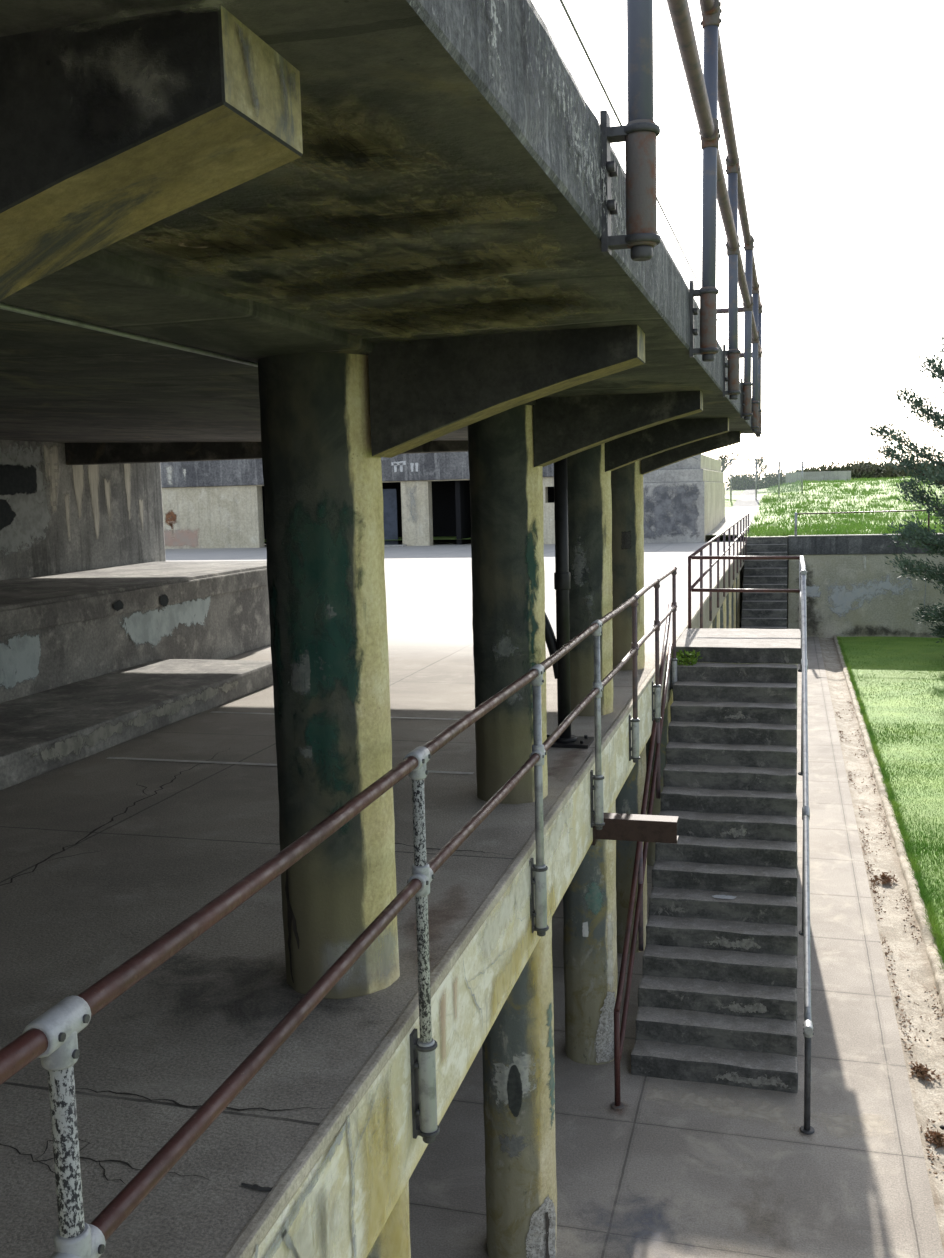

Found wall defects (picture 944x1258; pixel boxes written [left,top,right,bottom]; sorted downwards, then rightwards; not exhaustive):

leakage [285,112,450,184]
leakage [123,190,591,338]
peeling [0,633,41,690]
peeling [120,596,211,647]
peeling [269,502,363,814]
peeling [31,681,238,761]
spalling [595,914,615,1063]
peeling [491,1003,555,1126]
crack [0,1139,209,1185]
crack [75,1085,379,1258]
spalling [526,1195,556,1258]